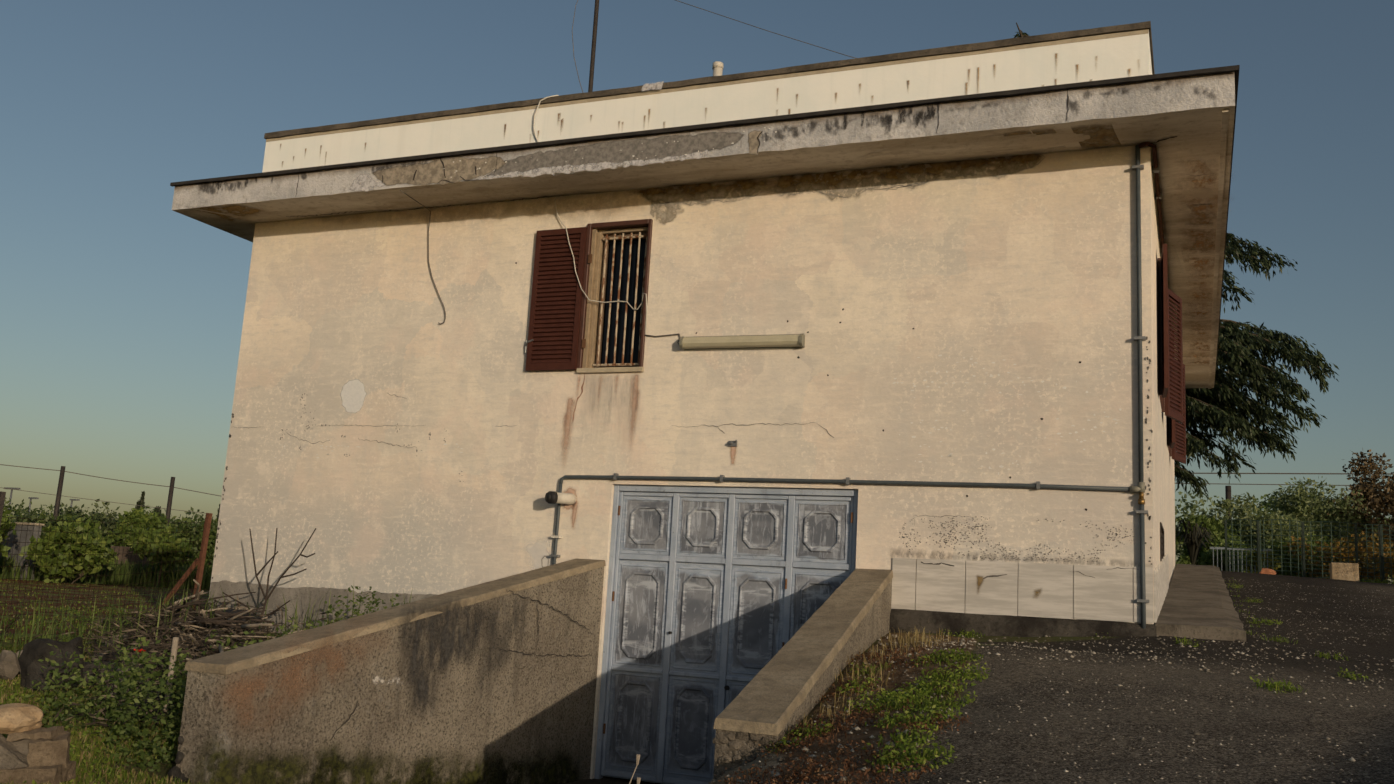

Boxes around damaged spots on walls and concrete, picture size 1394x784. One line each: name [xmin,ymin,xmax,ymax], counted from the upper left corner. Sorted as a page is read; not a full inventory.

peeling [350,127,777,191]
crack [673,422,834,438]
peeling [1143,337,1153,495]
peeling [899,516,1152,565]
water stain [404,603,518,706]
spalling [713,731,777,768]